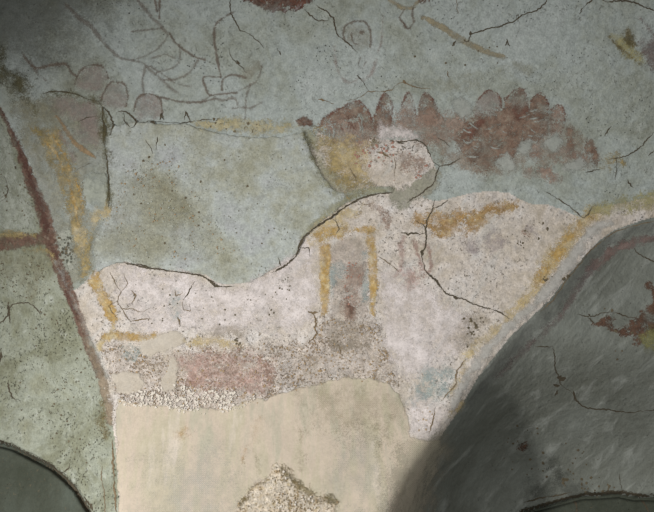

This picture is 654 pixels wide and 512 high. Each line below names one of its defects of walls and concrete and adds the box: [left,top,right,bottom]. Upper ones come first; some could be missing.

crack [305,5,355,50]
crack [452,0,547,46]
crack [272,192,392,273]
crack [377,138,509,319]
crack [108,262,231,325]
crack [537,346,654,413]
flaking render [236,463,339,512]